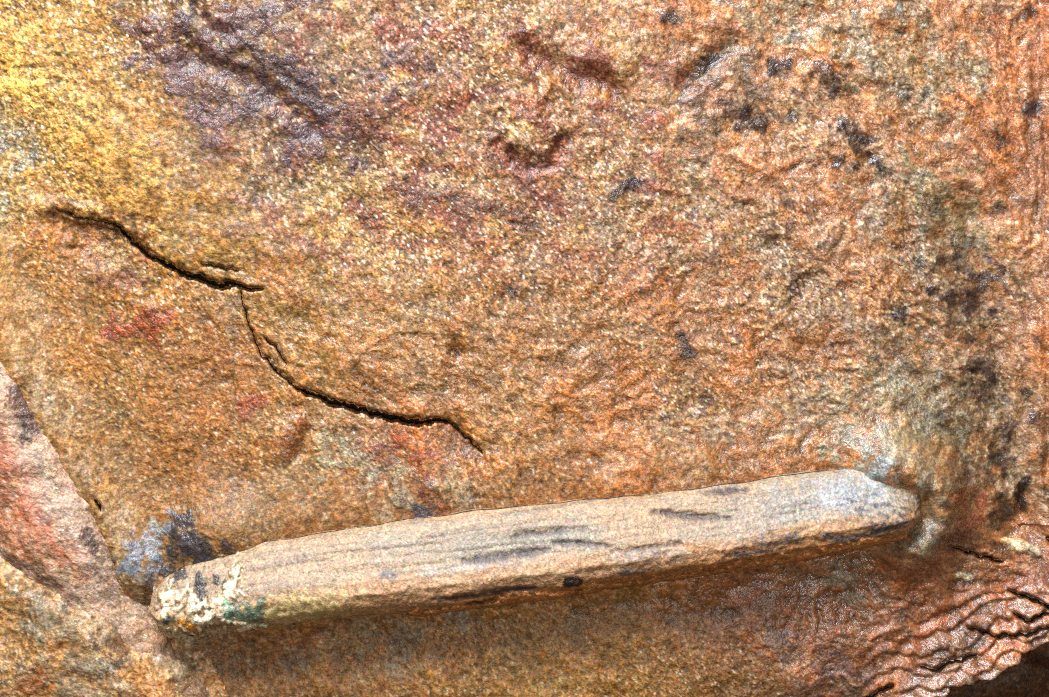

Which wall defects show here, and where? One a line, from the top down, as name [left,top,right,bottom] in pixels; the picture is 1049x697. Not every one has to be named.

crack [55,208,483,453]
peeling [1001,537,1043,557]
peeling [955,571,974,583]